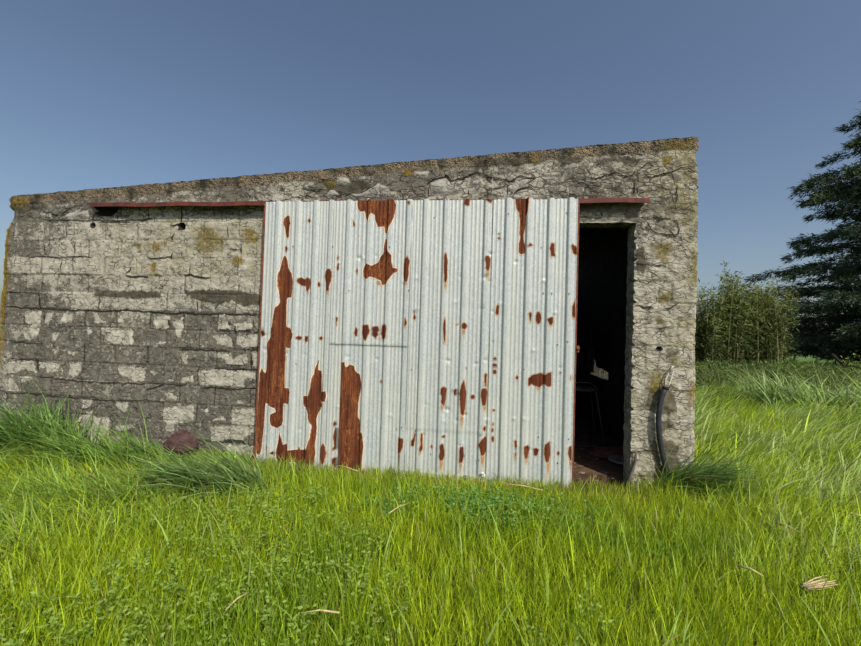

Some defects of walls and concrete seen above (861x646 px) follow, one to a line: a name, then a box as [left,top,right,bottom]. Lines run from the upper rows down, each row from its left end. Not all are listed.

crack [427,172,537,197]
crack [574,152,696,237]
rust [352,199,410,286]
rust [514,197,533,256]
leakage [94,289,161,299]
leakage [185,289,261,306]
crack [635,263,679,329]
rust [256,214,365,472]
rust [354,324,387,341]
rust [515,372,552,390]
rust [440,357,497,467]